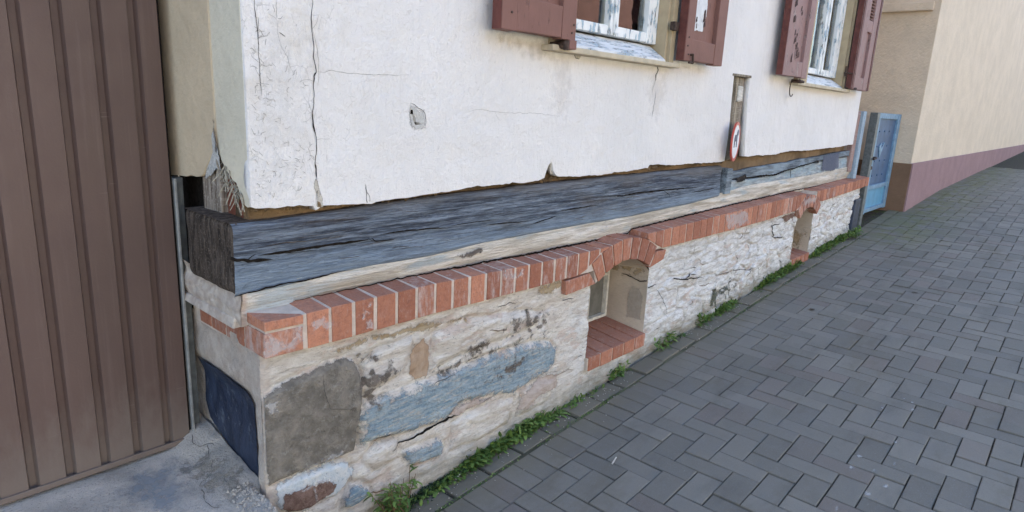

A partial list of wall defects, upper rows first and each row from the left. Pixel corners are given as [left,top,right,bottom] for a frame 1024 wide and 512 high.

flaking render [205,17,360,216]
flaking render [410,104,426,129]
flaking render [460,167,599,190]
crack [230,0,851,329]
crack [460,302,515,349]
crack [374,396,522,448]